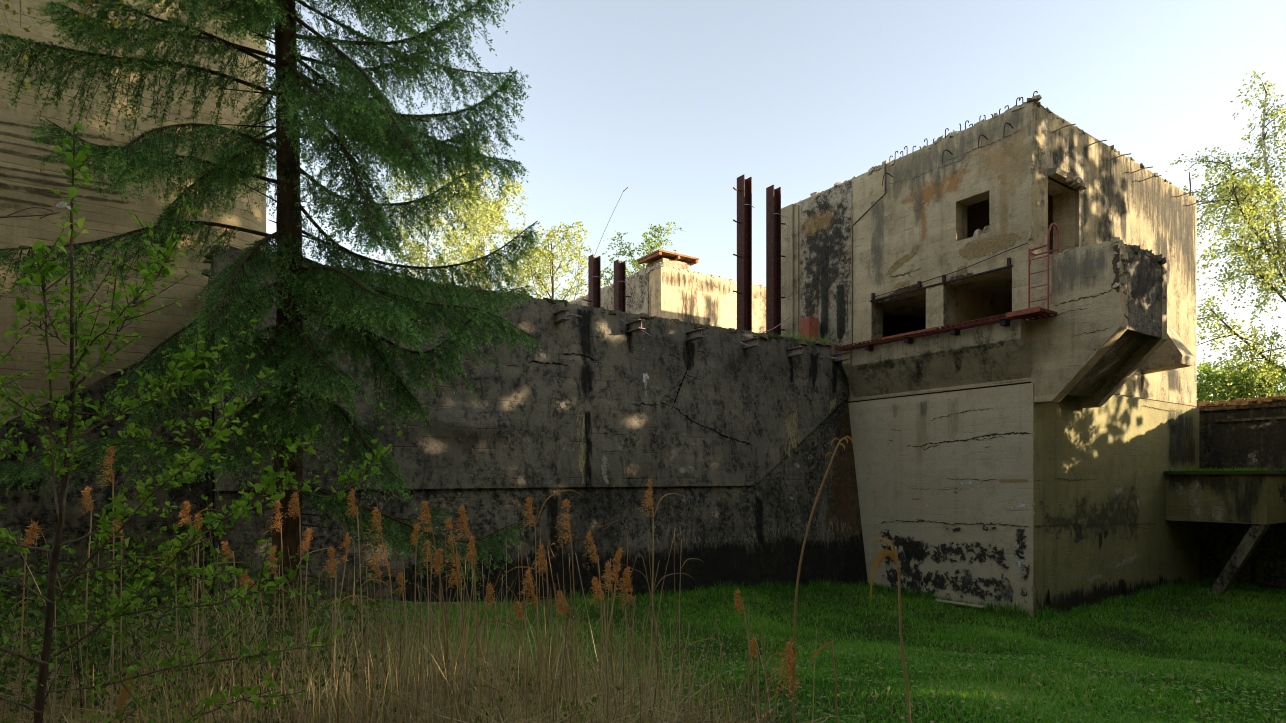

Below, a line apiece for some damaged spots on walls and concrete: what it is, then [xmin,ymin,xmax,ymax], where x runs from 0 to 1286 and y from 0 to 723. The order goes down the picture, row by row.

damp [866,112,1023,282]
spalling [799,91,1209,206]
damp [800,199,851,413]
peeling [952,232,1021,281]
spalling [1111,244,1122,292]
crack [633,368,754,446]
damp [393,485,1189,614]